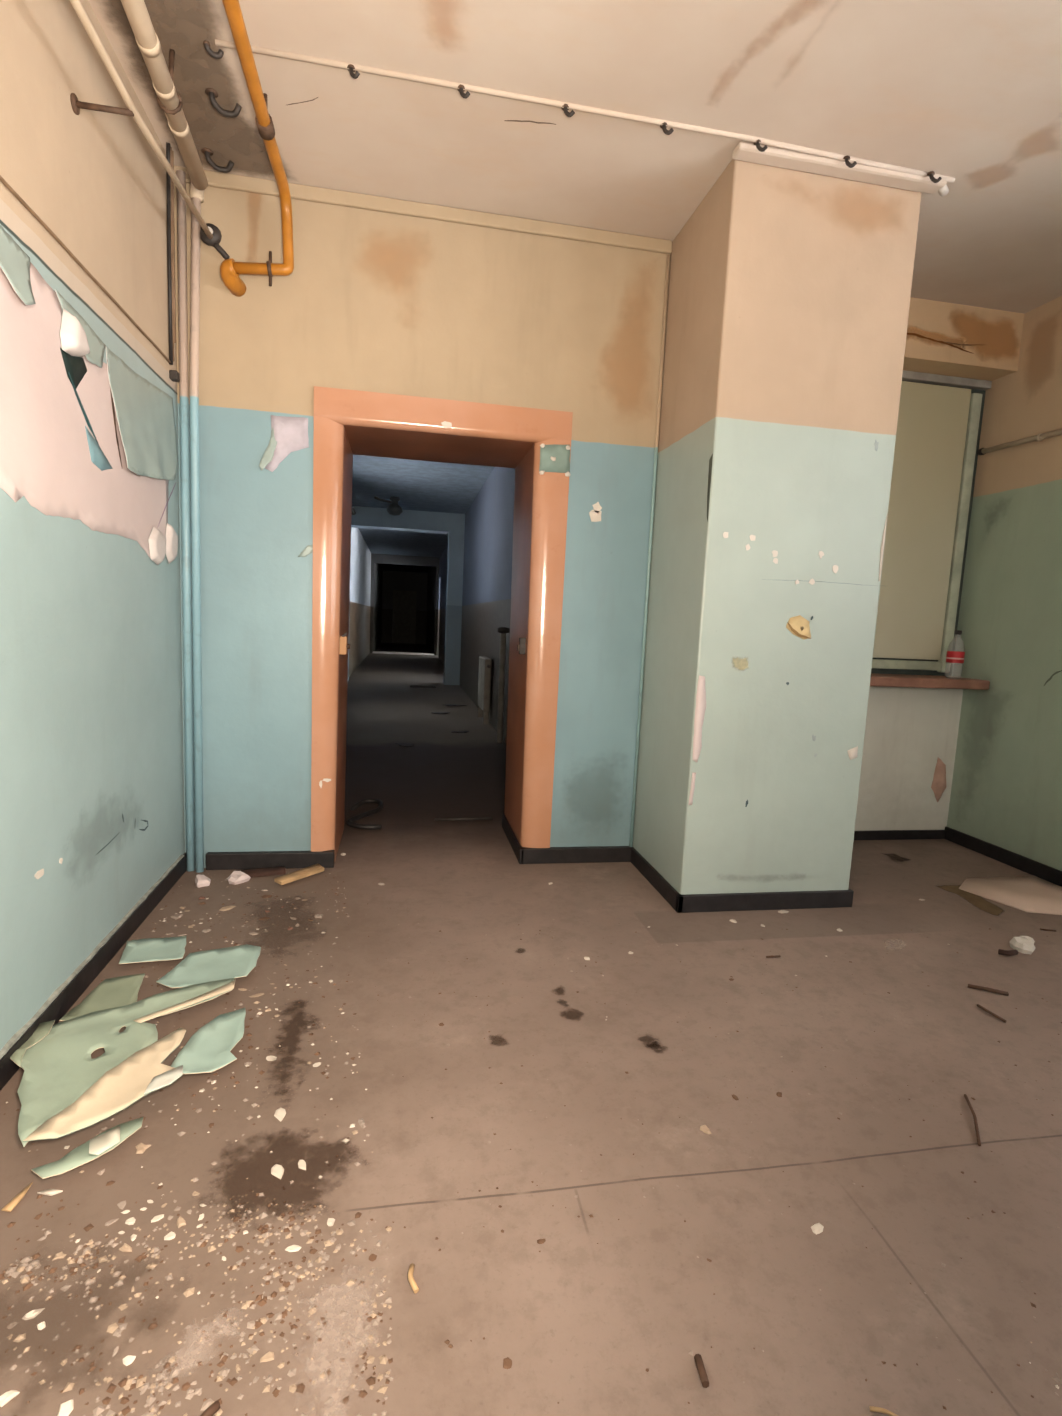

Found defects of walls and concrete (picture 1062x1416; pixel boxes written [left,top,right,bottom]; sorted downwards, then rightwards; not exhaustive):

crack [907,333,981,354]
peeling [0,225,178,565]
peeling [259,415,309,472]
flaking render [786,615,813,640]
flaking render [688,675,706,805]
peeling [931,758,947,802]